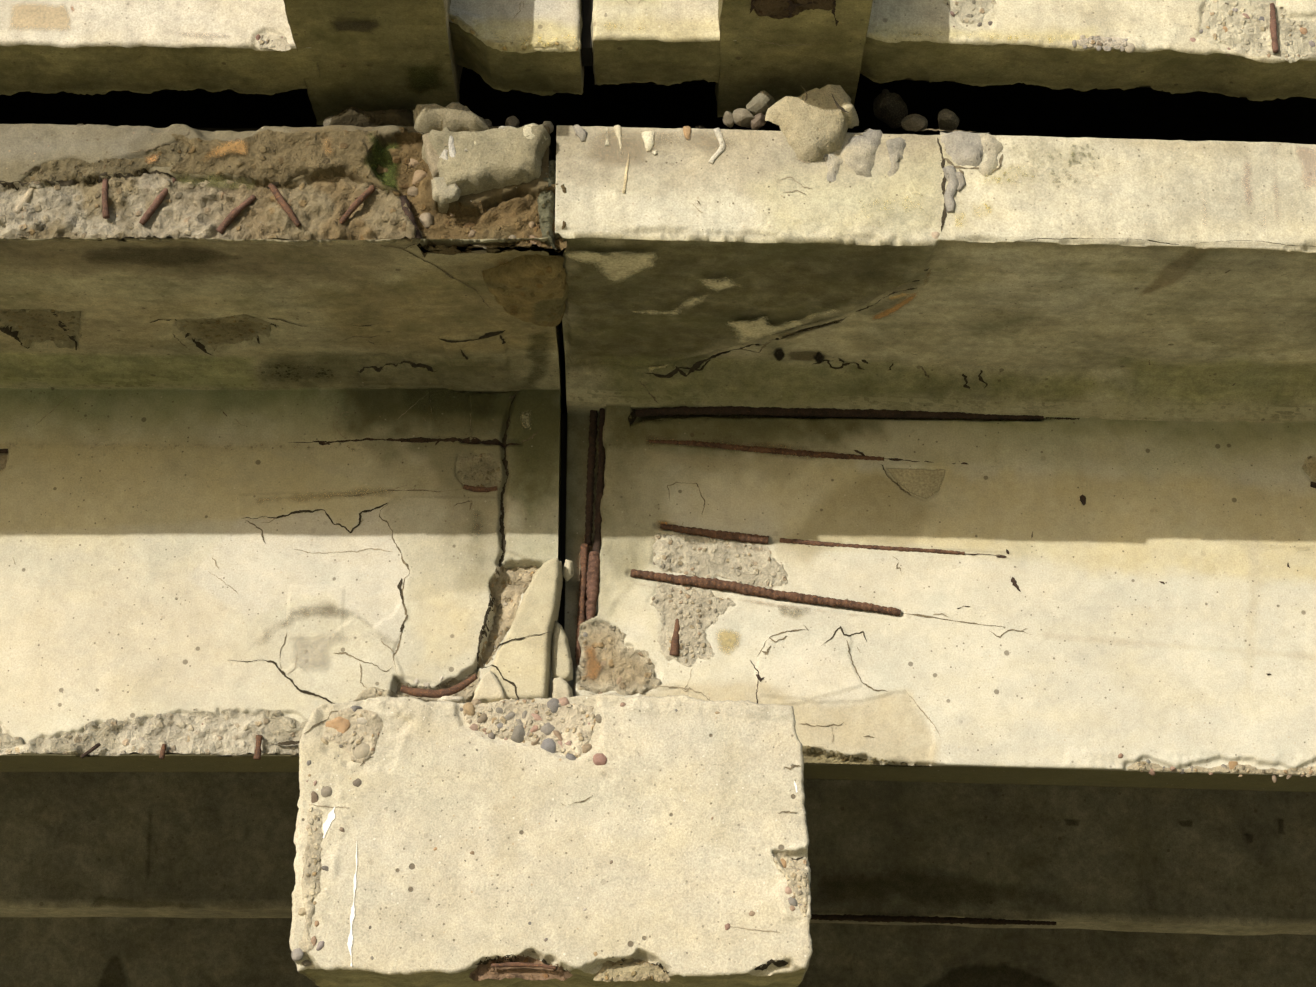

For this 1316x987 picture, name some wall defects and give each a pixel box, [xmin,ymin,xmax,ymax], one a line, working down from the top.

spalling [1190,0,1316,63]
spalling [499,123,548,141]
spalling [0,127,569,327]
damp [406,388,495,414]
spalling [0,449,8,471]
crack [241,244,548,700]
spalling [321,408,965,787]
crack [232,633,338,745]
crack [589,669,710,701]
crack [750,626,941,738]
spalling [1118,753,1316,783]
spalling [0,708,332,966]